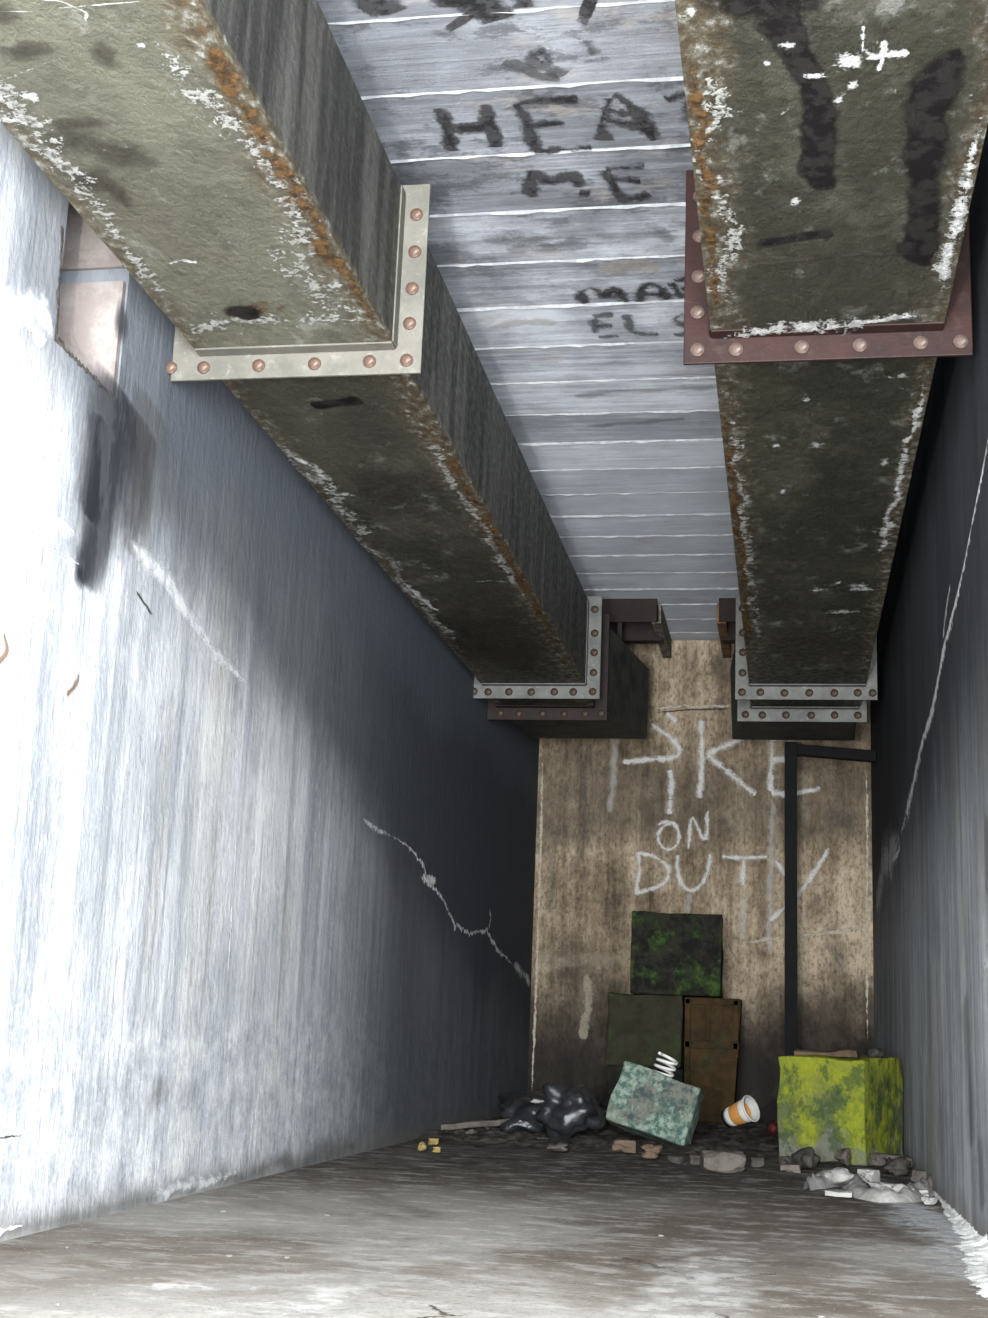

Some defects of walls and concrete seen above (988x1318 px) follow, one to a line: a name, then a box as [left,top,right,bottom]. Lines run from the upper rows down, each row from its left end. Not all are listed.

rust [198,25,376,322]
crack [364,819,530,985]
leakage [161,1174,230,1200]
leakage [888,1191,988,1300]